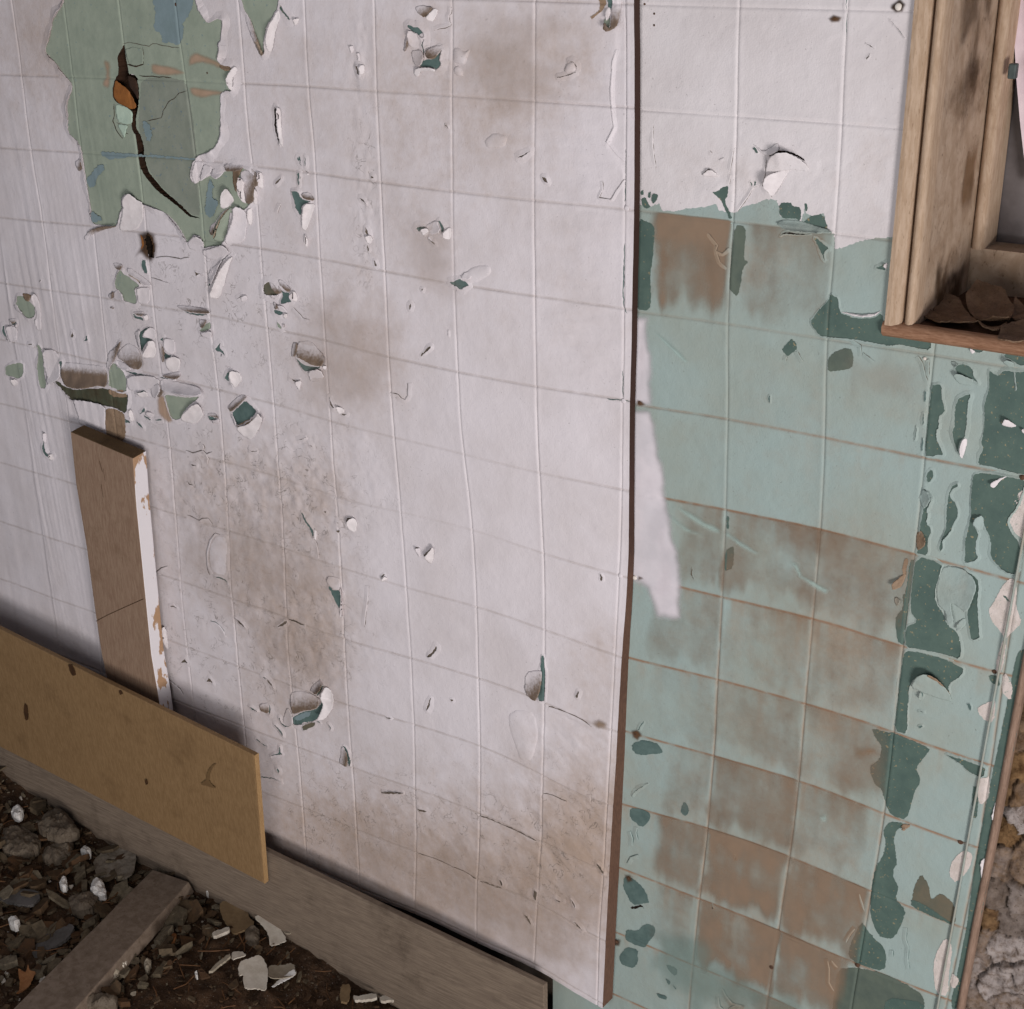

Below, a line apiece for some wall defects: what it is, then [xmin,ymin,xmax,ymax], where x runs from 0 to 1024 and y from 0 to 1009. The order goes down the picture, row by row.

peeling [403,5,449,77]
crack [113,42,199,218]
peeling [0,0,315,452]
leakage [655,213,731,308]
peeling [701,168,748,296]
peeling [748,144,833,264]
peeling [247,680,334,759]
peeling [524,654,548,704]
peeling [834,349,1024,1009]
peeling [623,877,649,909]
peeling [619,924,655,968]
leakage [659,778,867,1009]